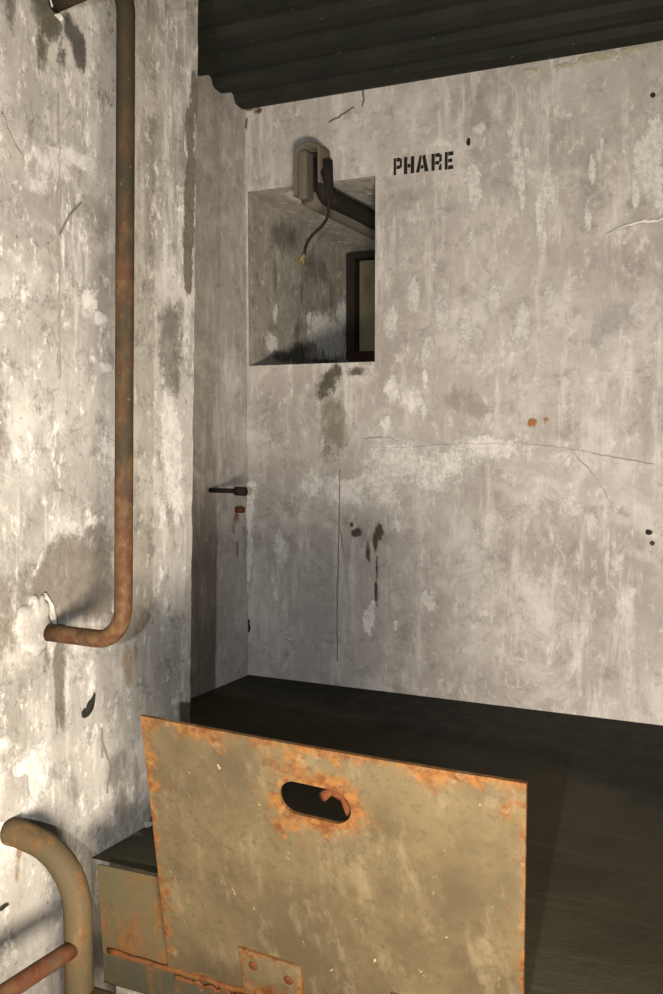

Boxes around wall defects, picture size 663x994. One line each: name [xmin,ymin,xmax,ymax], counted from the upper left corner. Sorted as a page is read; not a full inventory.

leakage [0,524,114,651]
leakage [297,434,521,605]